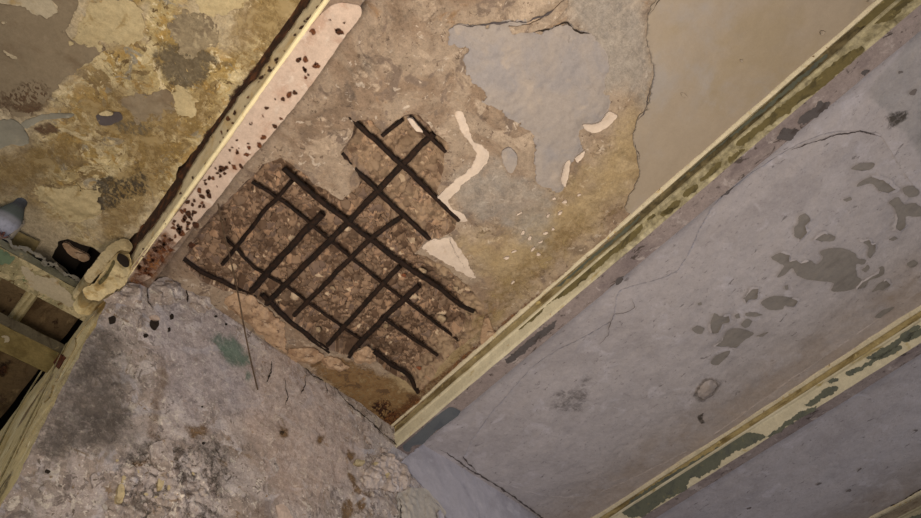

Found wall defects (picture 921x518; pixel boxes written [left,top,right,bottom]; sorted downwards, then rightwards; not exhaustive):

water stain [0,83,49,115]
water stain [0,123,79,192]
corrosion [129,0,323,286]
spalling [0,0,496,403]
peeling [448,0,617,256]
peeling [518,0,921,330]
corrosion [383,343,481,427]
peeling [396,407,538,518]
peeling [504,320,557,364]
peeling [622,325,921,518]
peeling [692,213,893,365]